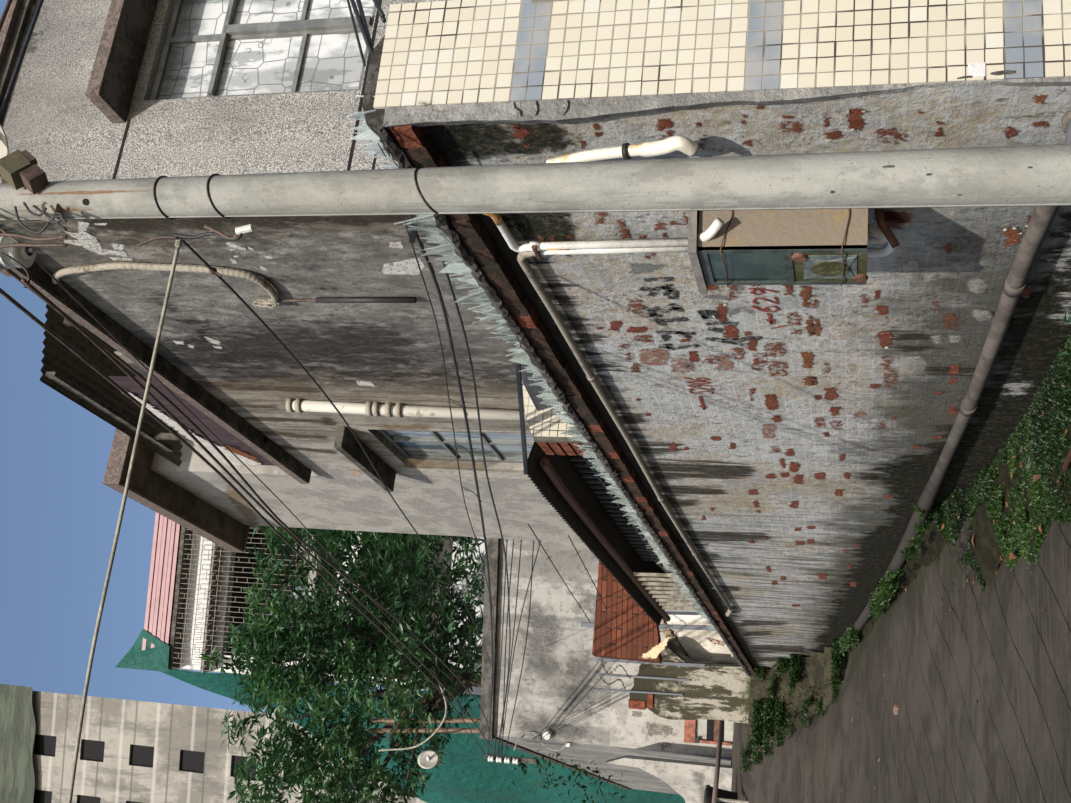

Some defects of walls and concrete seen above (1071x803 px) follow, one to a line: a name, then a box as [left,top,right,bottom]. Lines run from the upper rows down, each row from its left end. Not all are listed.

flaking render [389,125,426,148]
leakage [440,123,575,160]
spalling [655,118,673,140]
spalling [824,108,907,145]
peeling [64,221,133,261]
leakage [92,214,432,232]
corrosion [484,213,504,226]
spalling [595,211,688,239]
spalling [597,285,842,437]
spalling [749,388,825,484]
leakage [739,213,1071,662]
leakage [637,441,772,562]